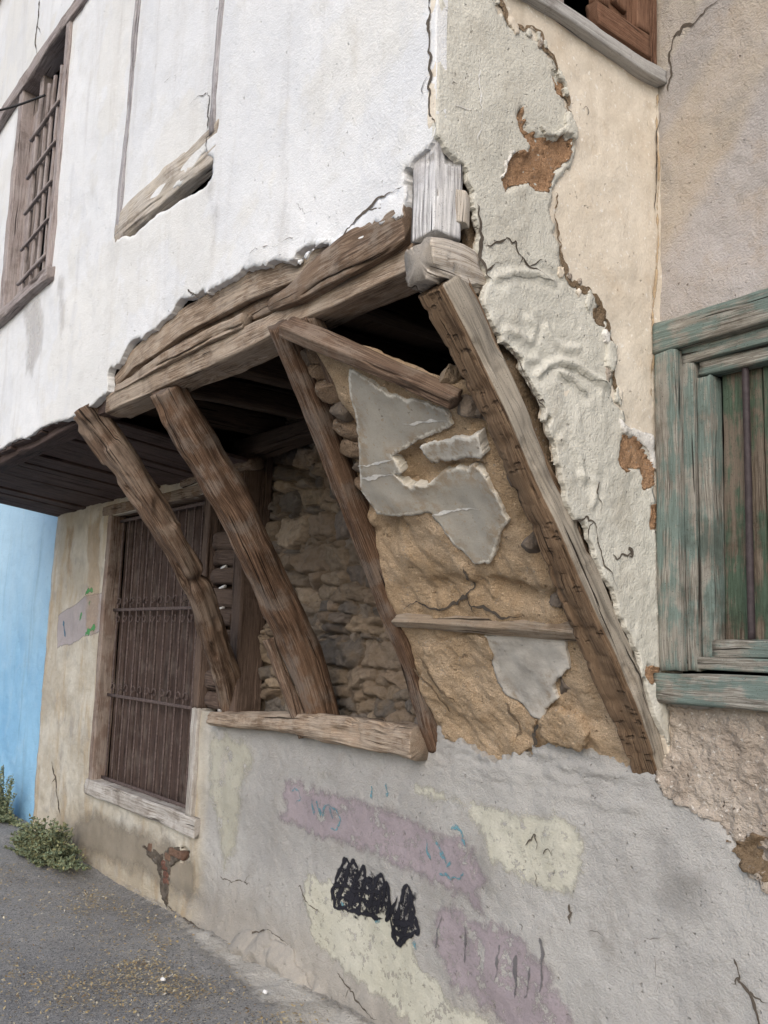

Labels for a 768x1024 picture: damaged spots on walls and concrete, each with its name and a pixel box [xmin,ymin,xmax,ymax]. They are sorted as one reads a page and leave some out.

crack [421,0,436,132]
crack [654,0,719,207]
crack [477,204,546,279]
spalling [495,0,656,490]
flaking render [348,368,511,564]
crack [405,569,522,620]
spalling [413,633,590,760]
spalling [655,706,768,894]
crack [731,959,765,1024]